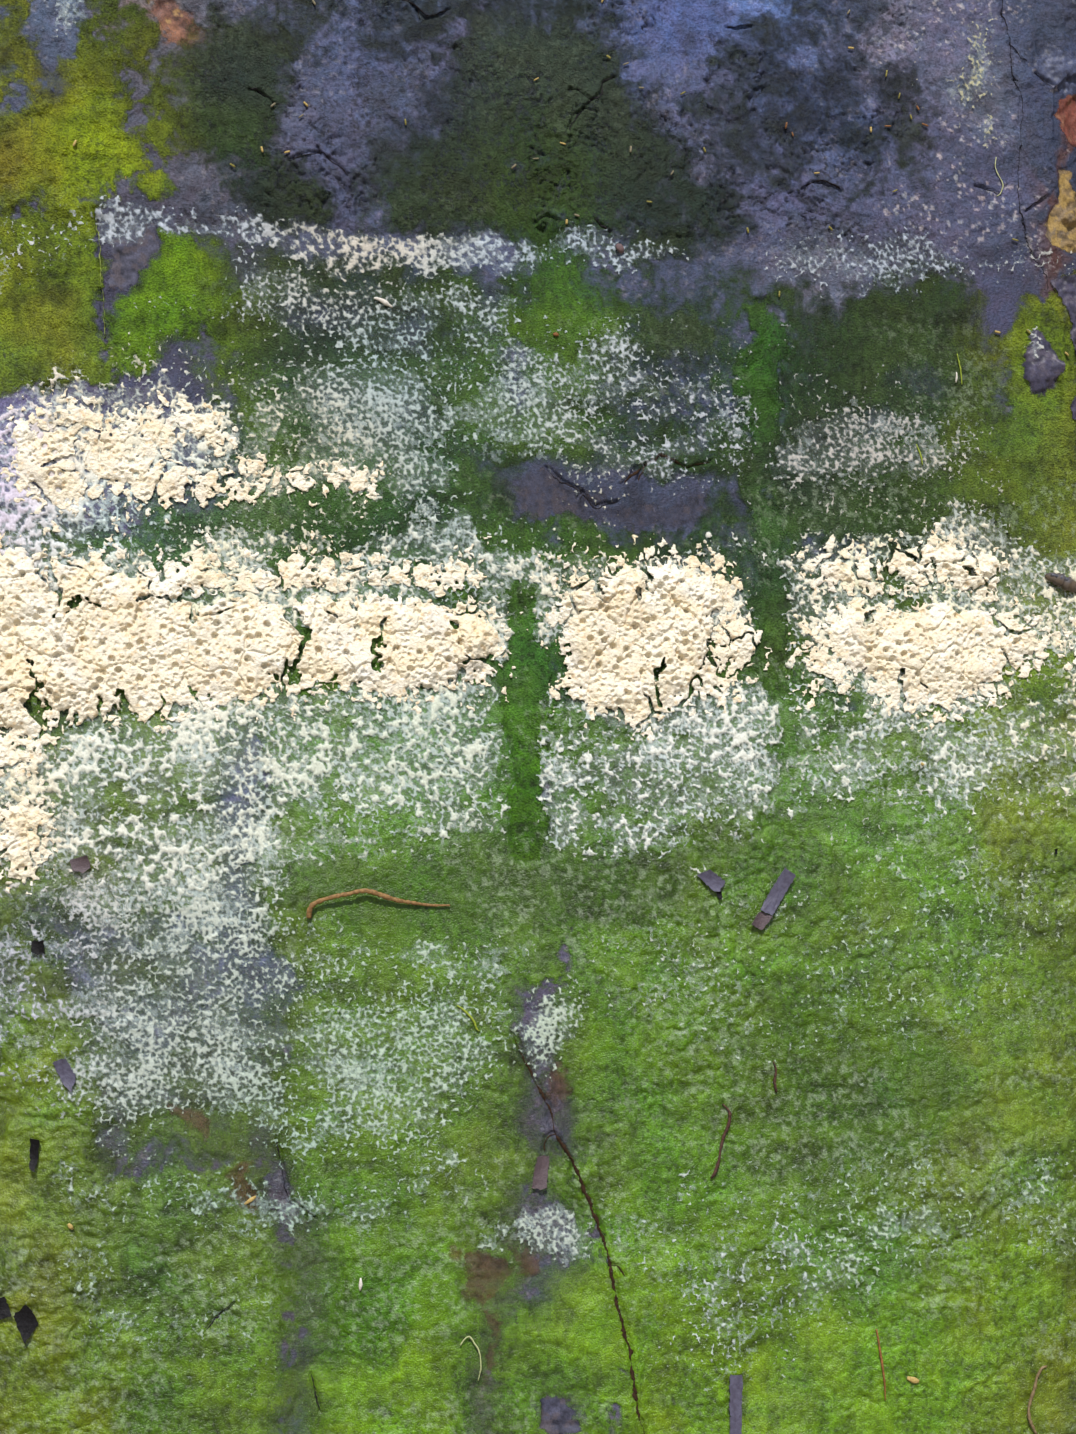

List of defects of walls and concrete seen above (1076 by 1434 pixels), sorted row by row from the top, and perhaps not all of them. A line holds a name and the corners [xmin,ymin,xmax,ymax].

damp [950,19,995,148]
crack [978,0,1052,290]
peeling [1029,44,1076,147]
spalling [1045,169,1076,253]
peeling [1050,274,1076,353]
damp [0,196,1076,1238]
damp [73,1245,169,1342]
damp [479,1208,592,1260]
damp [670,1153,1076,1370]